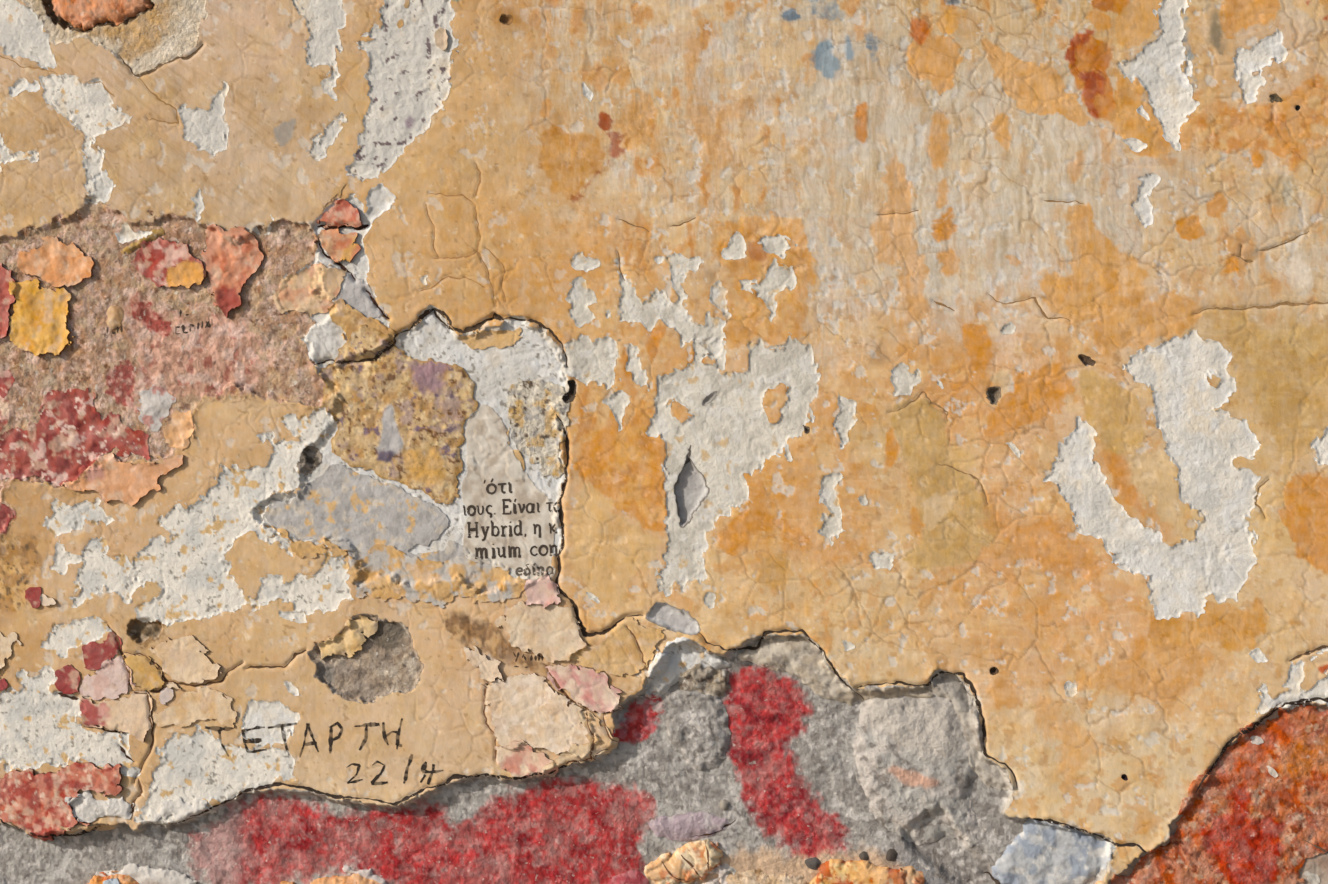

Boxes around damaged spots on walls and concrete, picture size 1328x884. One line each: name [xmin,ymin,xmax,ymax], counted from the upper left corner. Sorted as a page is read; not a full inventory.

peeling [345,0,459,182]
peeling [1118,0,1200,152]
crack [1235,231,1309,263]
crack [988,294,1070,321]
crack [1194,301,1328,314]
crack [890,392,948,420]
spalling [0,73,1116,884]
crack [938,464,988,504]
peeling [1043,330,1261,620]
crack [1254,479,1269,518]
spalling [1108,815,1183,884]
spalling [1299,840,1328,884]